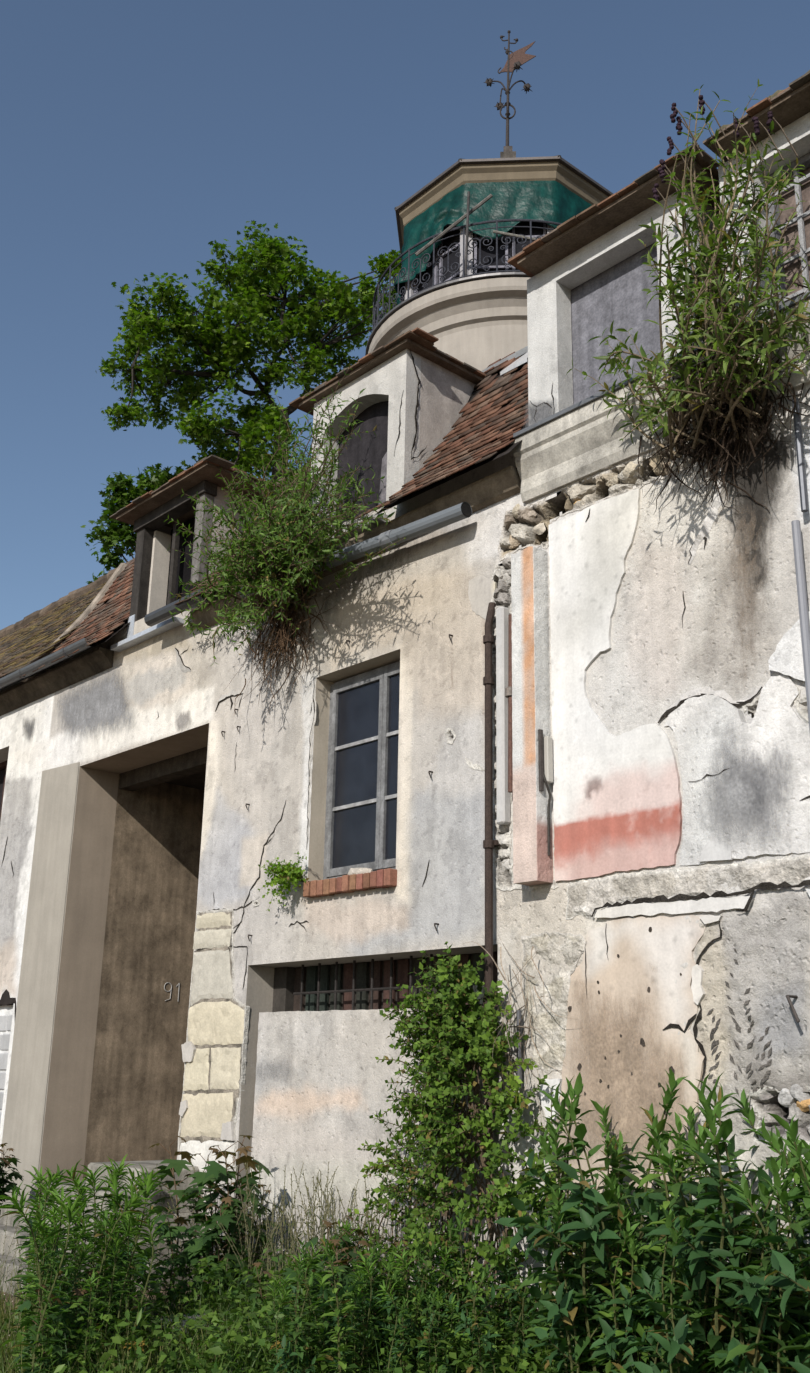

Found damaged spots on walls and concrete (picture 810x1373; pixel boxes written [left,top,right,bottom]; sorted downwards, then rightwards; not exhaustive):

crack [394,350,427,460]
crack [194,678,316,987]
spalling [445,728,456,744]
peeling [465,424,810,1194]
leakage [709,740,787,839]
leakage [579,997,680,1148]